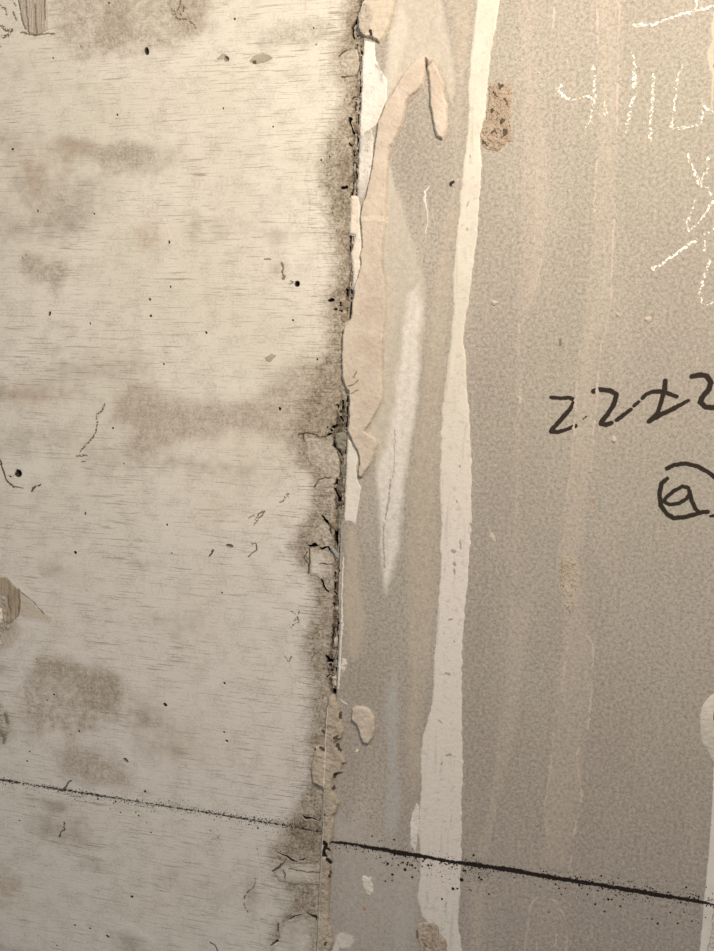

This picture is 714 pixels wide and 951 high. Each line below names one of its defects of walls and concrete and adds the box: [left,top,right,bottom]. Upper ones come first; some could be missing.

peeling [0,0,22,57]
damp [45,0,235,76]
damp [97,0,426,951]
spalling [0,577,54,645]
spalling [0,703,11,744]
damp [0,615,146,858]
peeling [270,912,327,951]